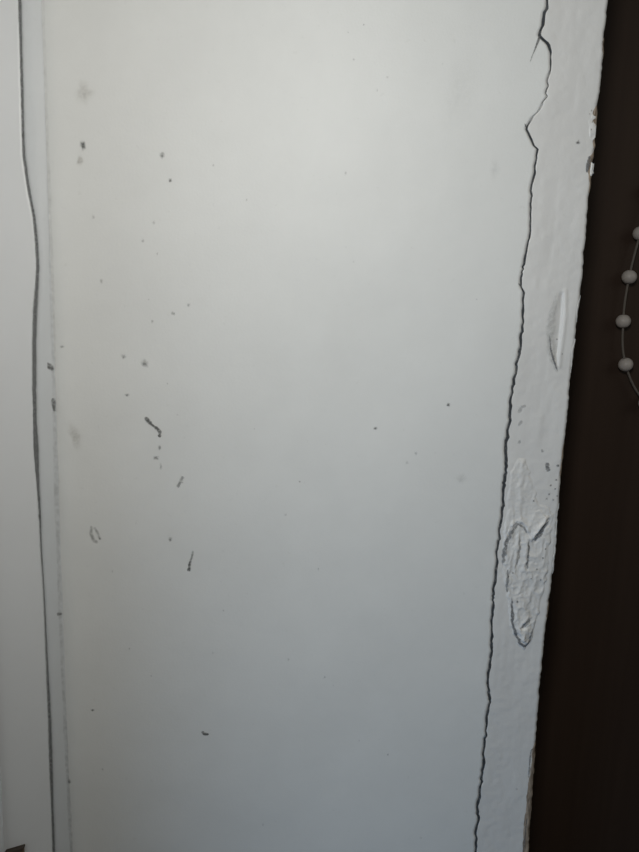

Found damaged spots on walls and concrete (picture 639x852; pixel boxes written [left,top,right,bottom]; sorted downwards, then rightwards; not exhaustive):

crack [534,0,552,98]
crack [475,121,539,852]
flaking render [502,458,559,650]